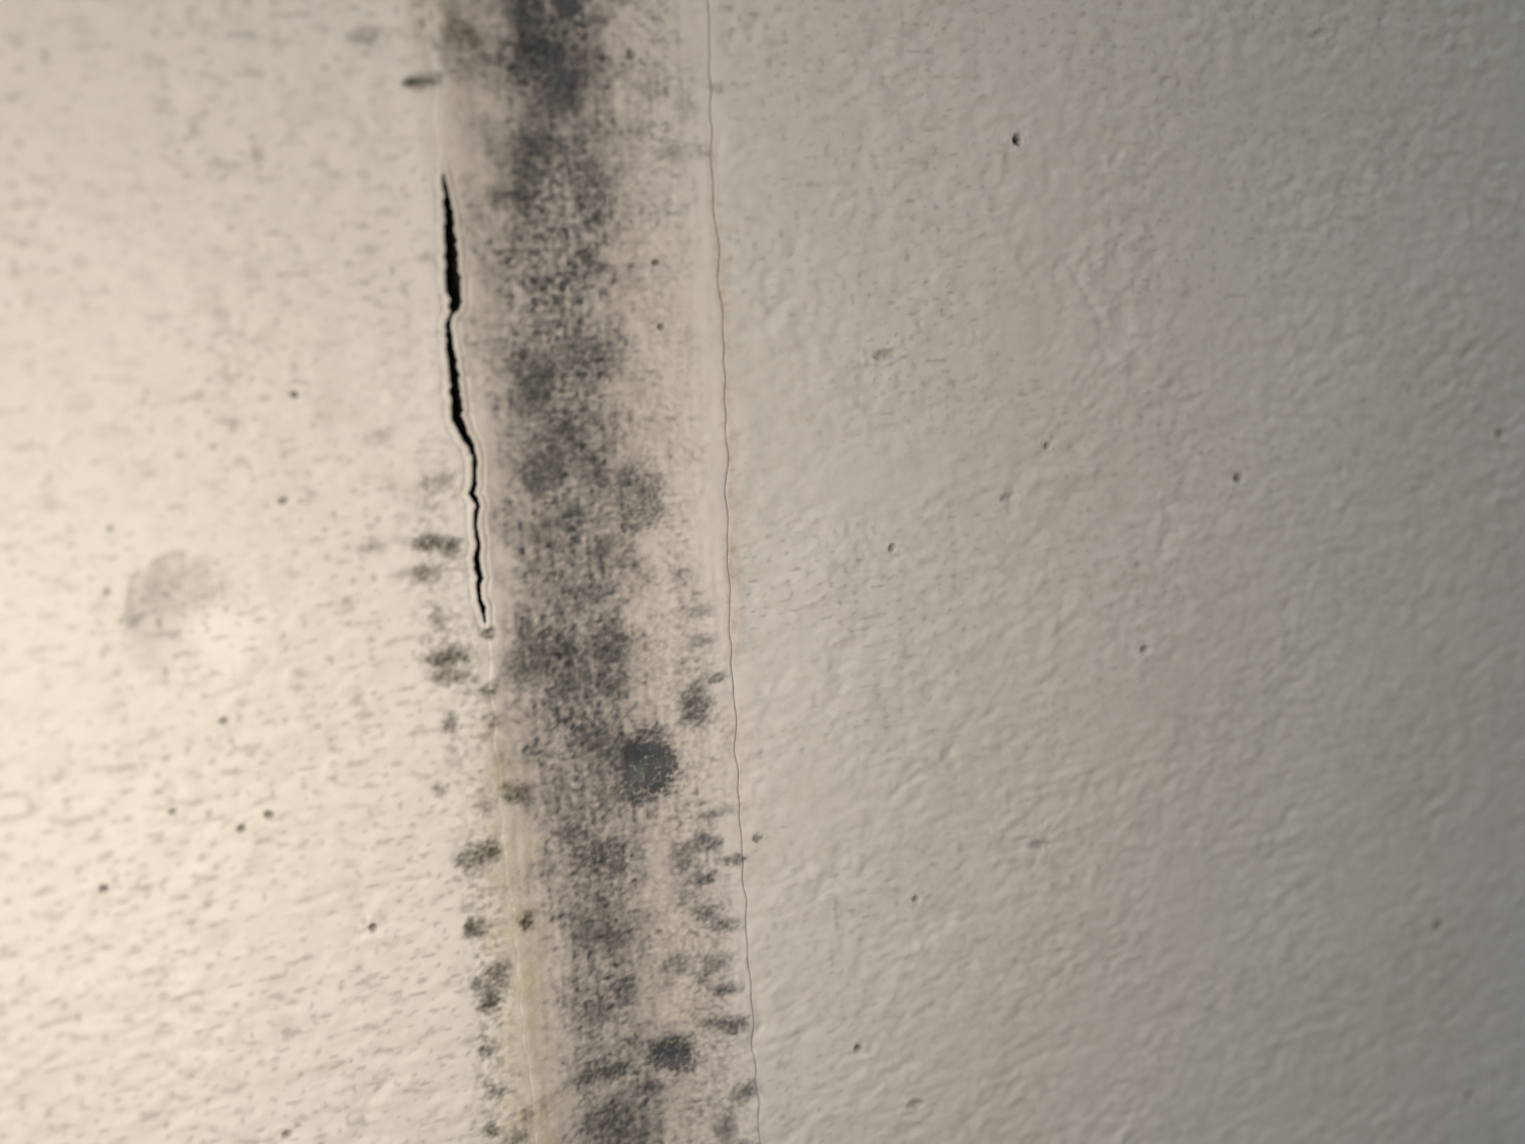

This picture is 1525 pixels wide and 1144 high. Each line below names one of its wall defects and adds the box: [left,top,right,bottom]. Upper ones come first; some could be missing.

leakage [406,78,434,86]
crack [435,162,493,633]
leakage [482,0,678,907]
mould [414,536,454,579]
mould [428,649,467,679]
leakage [682,680,720,722]
mould [464,922,483,936]
leakage [507,913,532,935]
mould [573,920,628,1009]
mould [474,970,502,1012]
leakage [721,1018,744,1035]
mould [579,1034,696,1144]